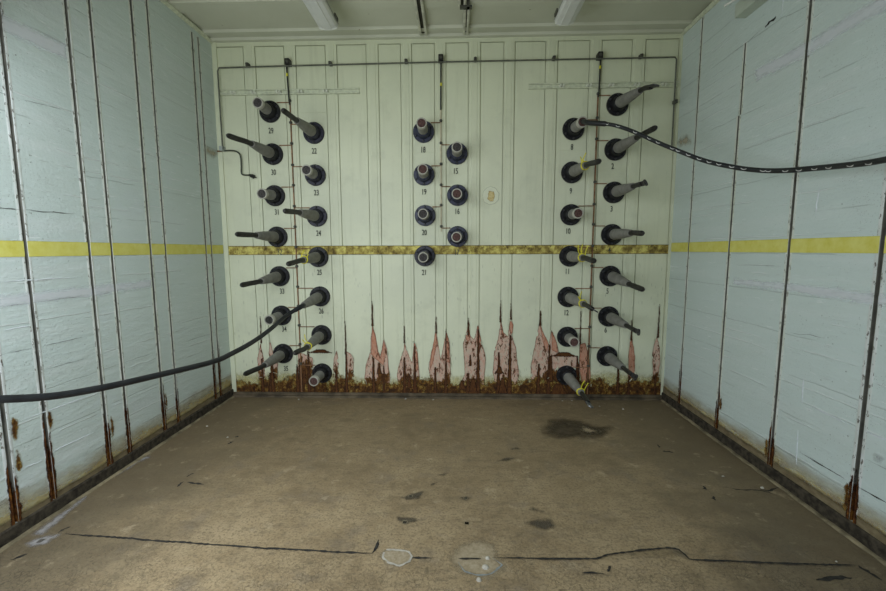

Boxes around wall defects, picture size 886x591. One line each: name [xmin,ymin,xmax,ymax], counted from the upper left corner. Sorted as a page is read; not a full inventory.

corrosion [212,352,222,399]
peeling [257,318,278,392]
peeling [296,301,520,400]
corrosion [236,373,661,395]
peeling [531,311,591,401]
peeling [615,321,636,395]
peeling [651,304,660,395]
corrosion [6,417,23,526]
corrosion [42,412,57,501]
corrosion [843,470,859,524]
crack [58,527,379,554]